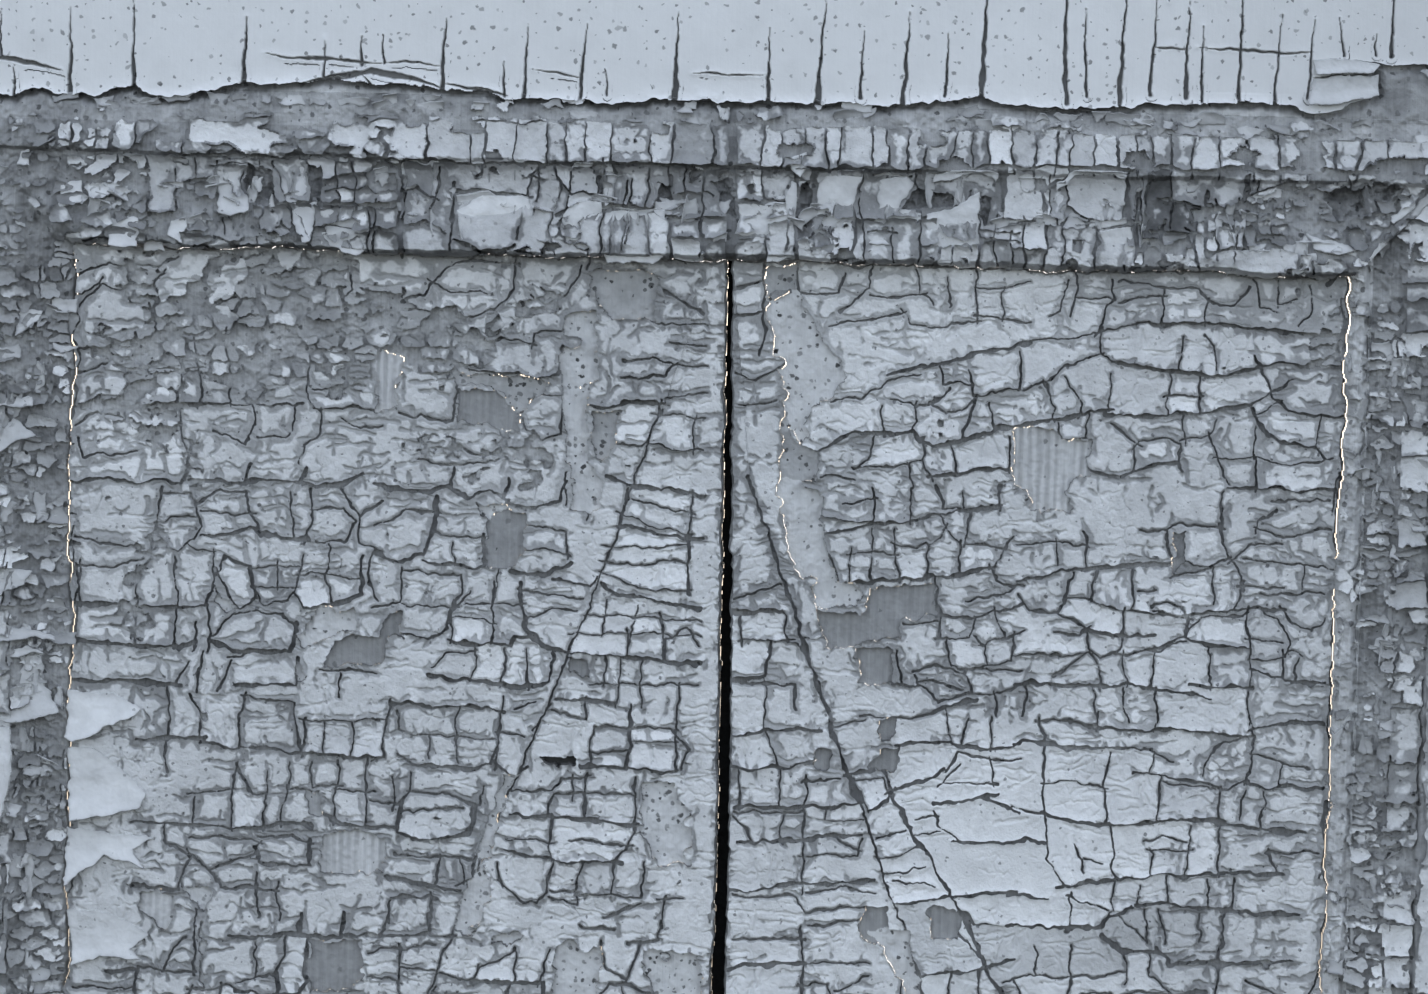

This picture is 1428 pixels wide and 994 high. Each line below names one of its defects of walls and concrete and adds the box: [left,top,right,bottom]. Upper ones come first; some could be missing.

crack [0,3,77,96]
crack [128,0,140,87]
crack [238,13,612,101]
crack [668,9,775,102]
crack [811,0,992,105]
crack [1059,0,1399,109]
peeling [1309,58,1381,106]
peeling [0,91,731,994]
peeling [735,102,1428,994]
crack [62,243,1348,994]